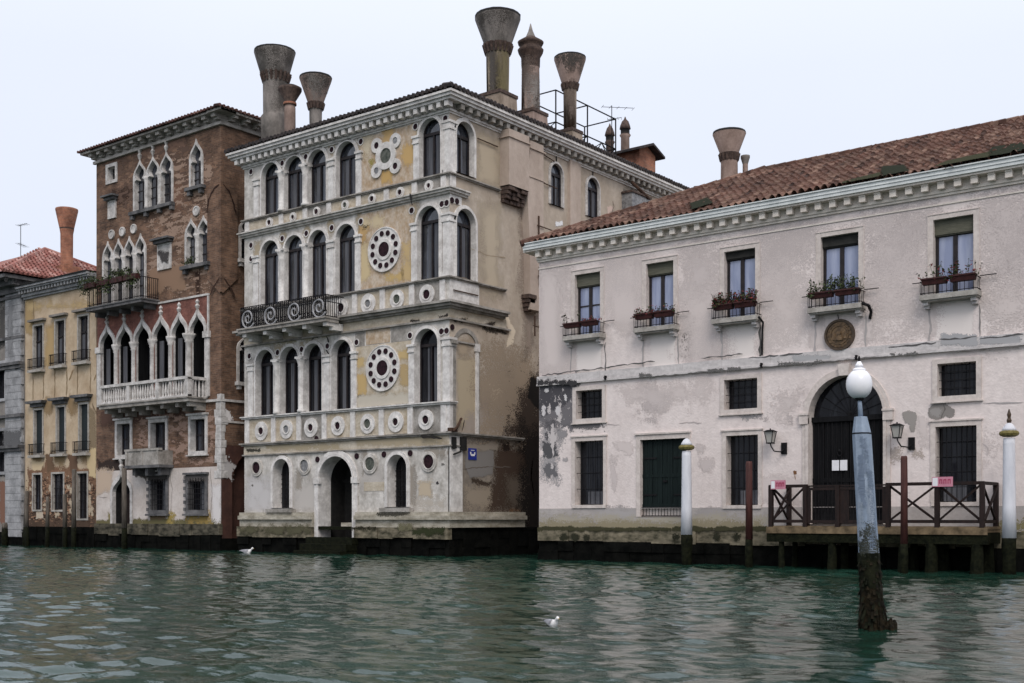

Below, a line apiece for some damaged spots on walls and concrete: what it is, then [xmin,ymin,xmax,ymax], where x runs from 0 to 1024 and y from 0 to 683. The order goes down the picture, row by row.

leakage [456,131,1024,527]
spalling [134,409,236,480]
peeling [528,376,571,478]
peeling [902,403,955,432]